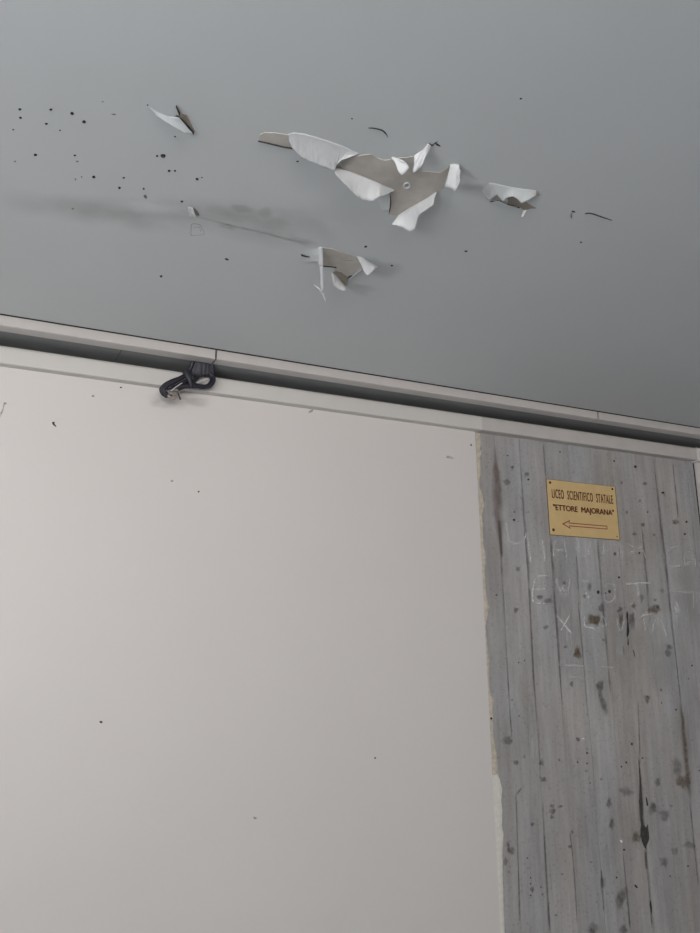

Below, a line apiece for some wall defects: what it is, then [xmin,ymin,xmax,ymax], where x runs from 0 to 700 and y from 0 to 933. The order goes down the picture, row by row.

peeling [147,104,195,135]
peeling [258,132,460,232]
peeling [481,183,540,217]
peeling [299,247,377,302]